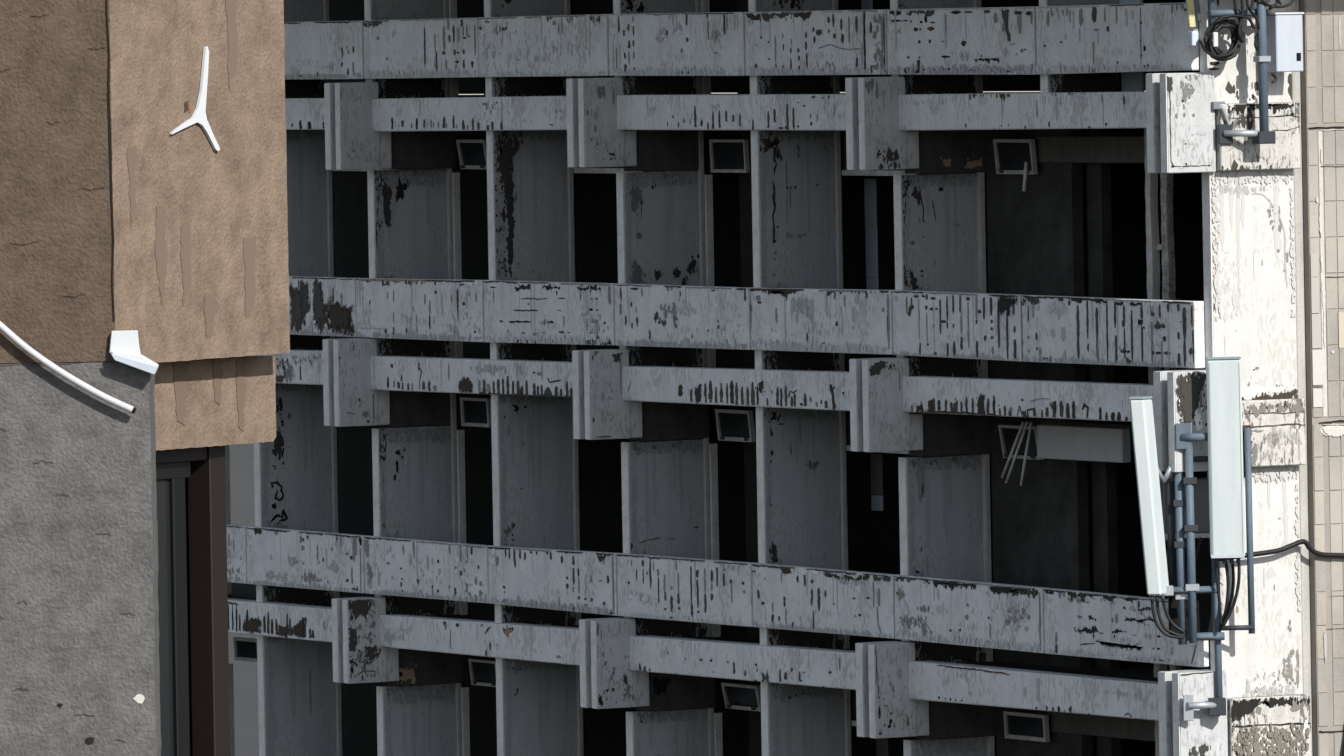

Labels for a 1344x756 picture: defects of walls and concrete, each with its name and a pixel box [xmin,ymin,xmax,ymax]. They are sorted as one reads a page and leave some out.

spalling [789,11,812,25]
water stain [285,0,1211,169]
water stain [1212,81,1296,356]
spalling [290,283,355,335]
water stain [212,93,1207,756]
water stain [1244,367,1305,632]
peeling [781,566,870,616]
water stain [1220,560,1232,616]
spalling [243,616,306,638]
water stain [1232,649,1311,756]
water stain [1180,718,1215,756]
peeling [1232,720,1310,756]